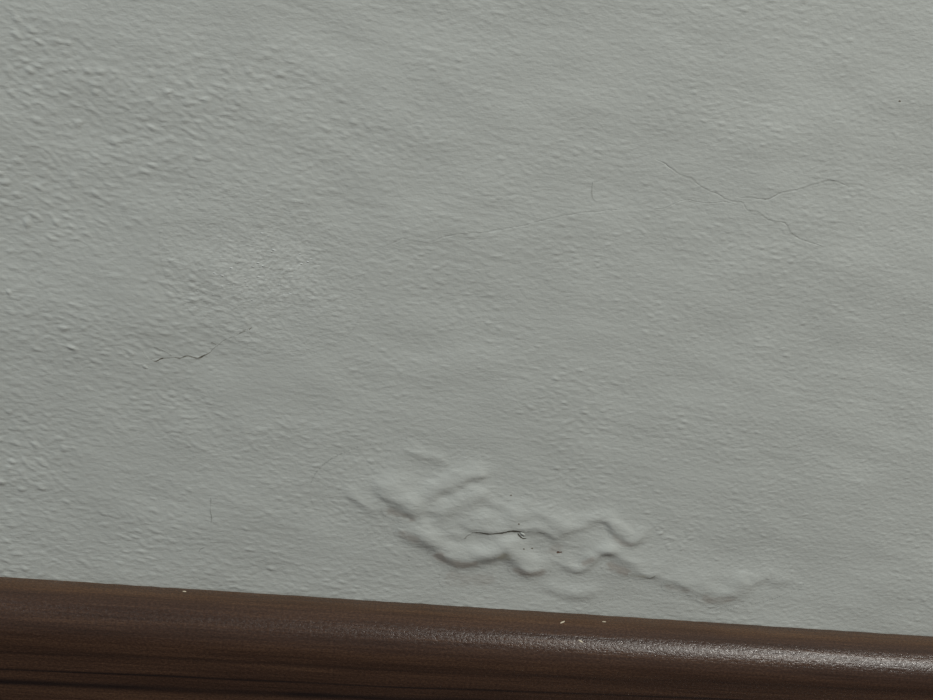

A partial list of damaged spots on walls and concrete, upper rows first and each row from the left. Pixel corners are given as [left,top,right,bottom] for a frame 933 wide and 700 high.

crack [142,326,257,362]
crack [464,530,545,539]